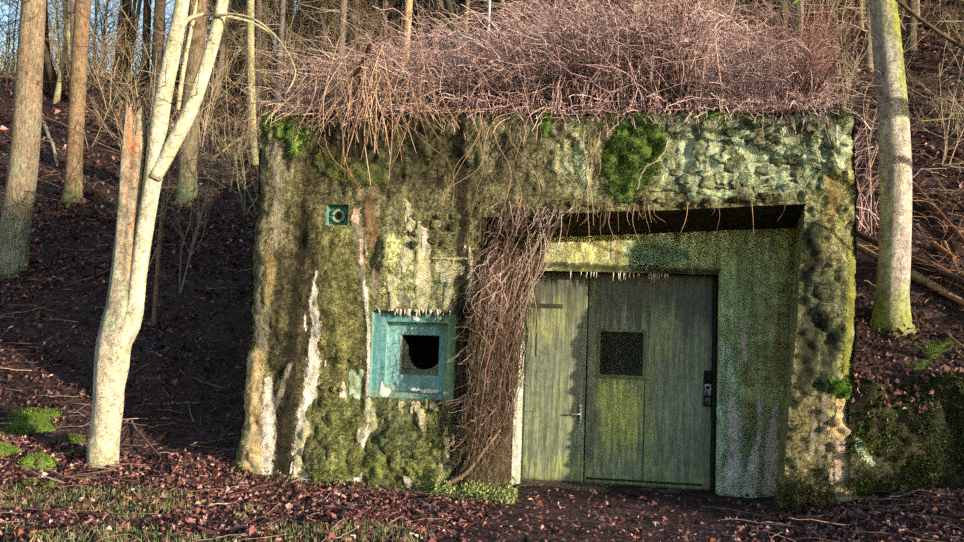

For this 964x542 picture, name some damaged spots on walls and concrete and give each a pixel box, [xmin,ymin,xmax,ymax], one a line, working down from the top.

corrosion [365,188,378,247]
flaking render [408,210,461,250]
damp [805,222,821,278]
damp [799,292,875,502]